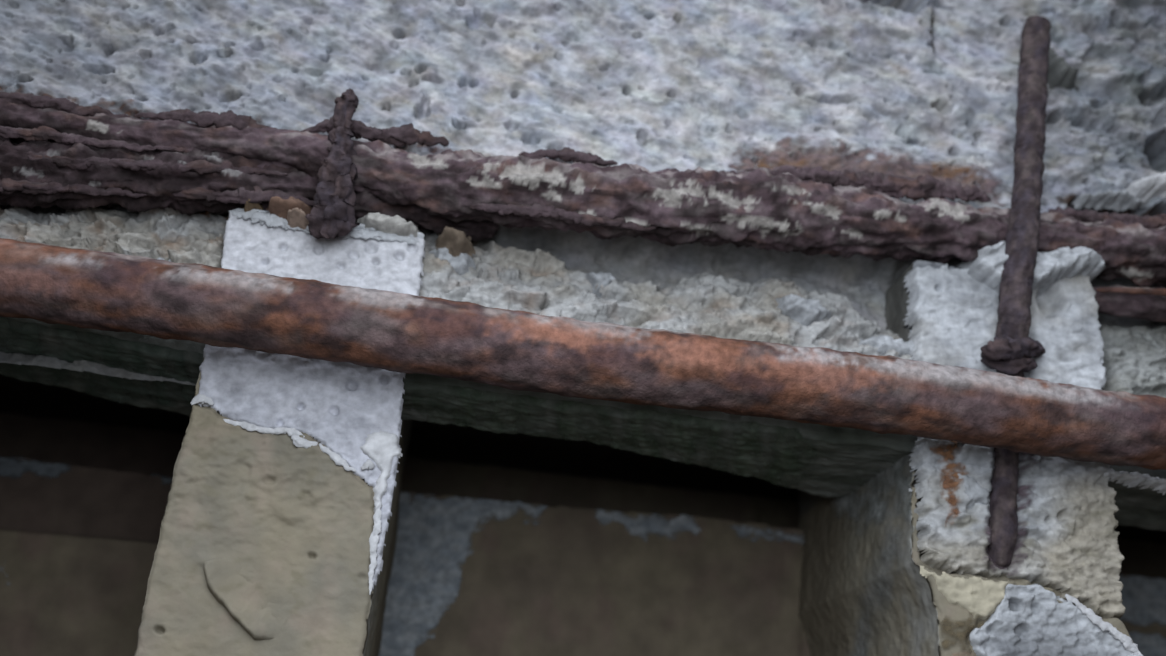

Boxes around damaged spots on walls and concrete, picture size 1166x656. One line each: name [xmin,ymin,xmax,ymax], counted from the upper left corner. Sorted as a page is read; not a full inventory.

rust [0,86,334,219]
spalling [0,196,999,372]
rust [0,238,1166,522]
rust [351,119,1011,264]
spalling [1024,275,1166,398]
rust [1038,194,1166,322]
spalling [1072,172,1166,212]
flaking render [191,344,548,656]
peeling [595,509,700,541]
rust [986,485,1032,572]
spalling [908,437,1166,656]